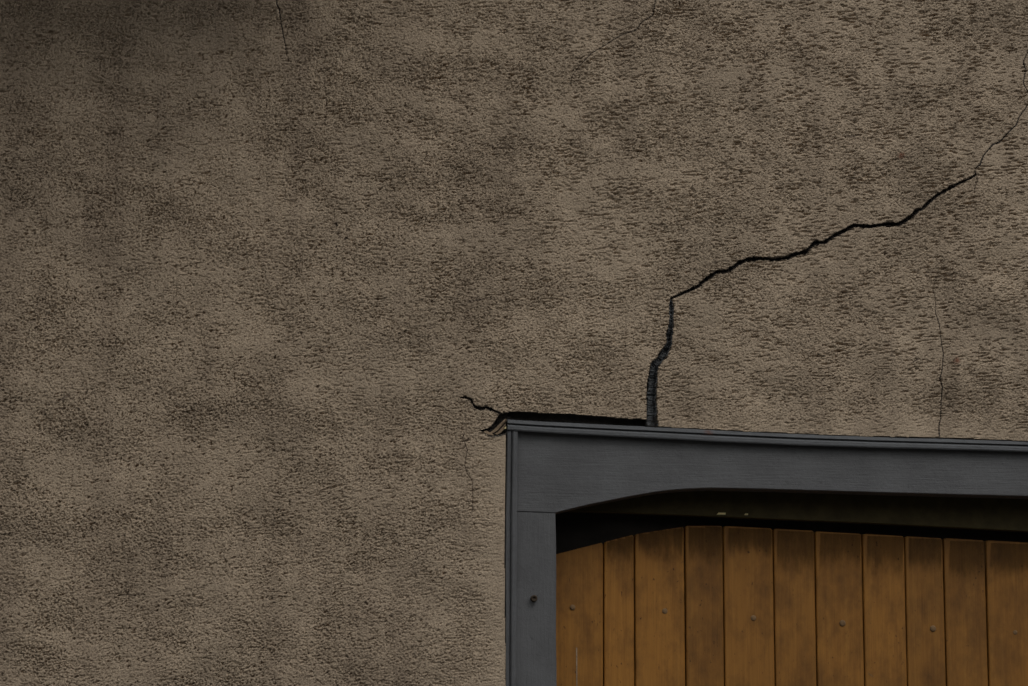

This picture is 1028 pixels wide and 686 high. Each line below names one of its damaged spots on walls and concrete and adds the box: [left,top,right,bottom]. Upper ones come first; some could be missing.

crack [645,52,1028,438]
crack [461,396,502,512]